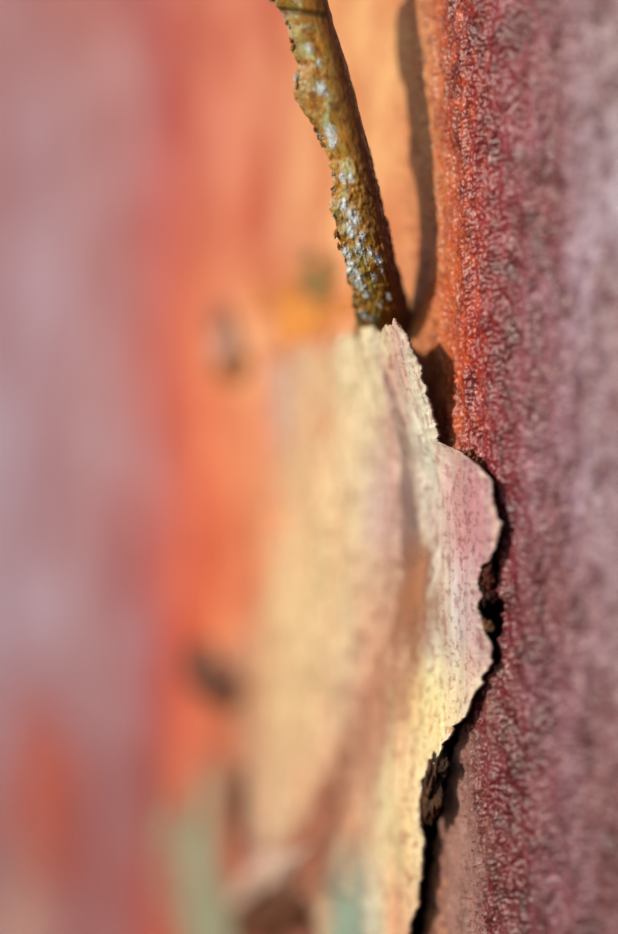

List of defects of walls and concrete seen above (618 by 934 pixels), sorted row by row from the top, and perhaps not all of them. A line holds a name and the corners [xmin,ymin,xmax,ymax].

peeling [459,448,486,471]
peeling [479,564,498,632]
peeling [230,761,249,860]
peeling [420,725,483,934]
peeling [229,843,313,934]